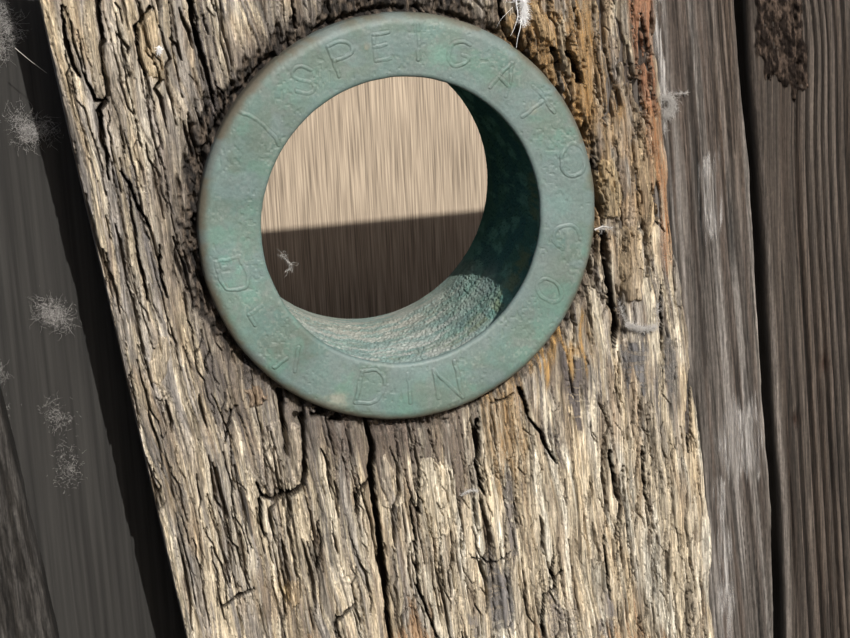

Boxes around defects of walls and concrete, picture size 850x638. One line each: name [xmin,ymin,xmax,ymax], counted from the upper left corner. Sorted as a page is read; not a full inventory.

crack [60,0,167,301]
crack [255,387,342,536]
crack [471,417,483,494]
crack [491,386,557,464]
crack [314,521,322,568]
crack [353,417,392,638]
crack [334,606,352,634]